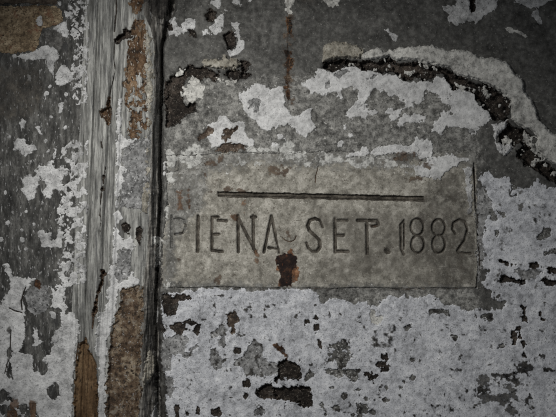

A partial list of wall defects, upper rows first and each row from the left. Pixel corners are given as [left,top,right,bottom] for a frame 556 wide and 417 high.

flaking render [0,0,90,113]
flaking render [163,0,252,128]
corrosion [281,14,295,104]
peeling [0,18,158,417]
corrosion [275,249,300,287]
peeling [160,167,556,417]